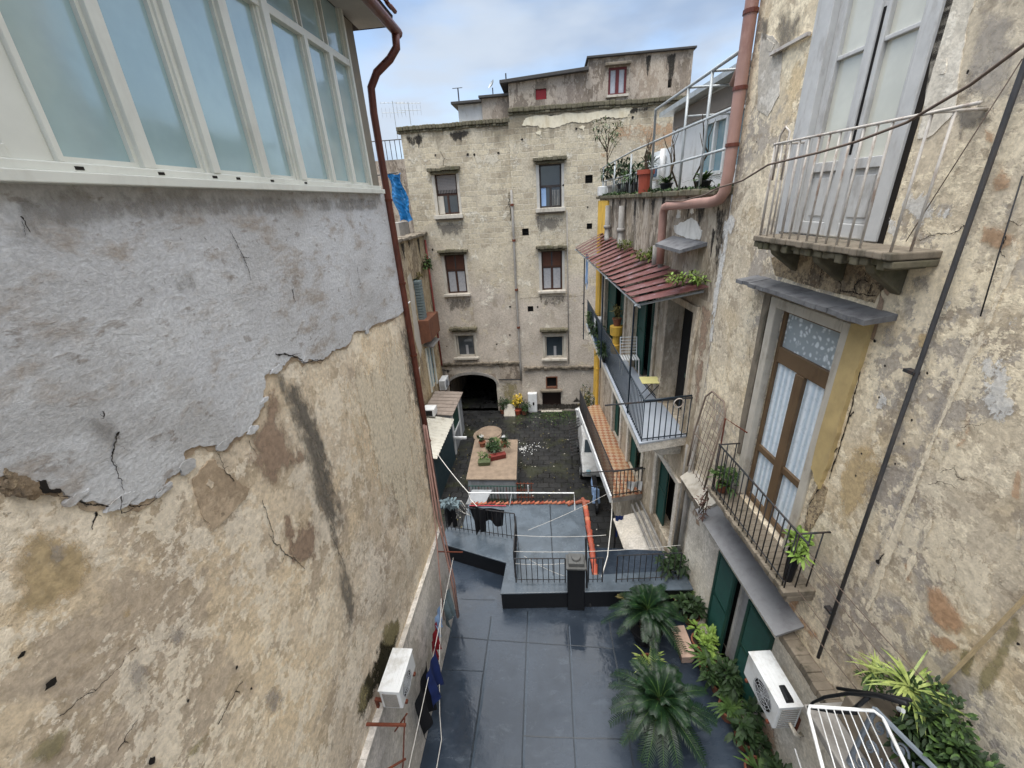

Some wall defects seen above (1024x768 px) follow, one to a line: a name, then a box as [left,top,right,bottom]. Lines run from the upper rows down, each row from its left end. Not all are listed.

peeling [521,107,634,141]
peeling [674,209,702,240]
peeling [0,183,422,530]
peeling [982,358,1014,422]
water stain [19,534,91,610]
crack [57,411,157,530]
crack [262,500,305,569]
water stain [249,378,354,623]
mould [358,620,399,714]